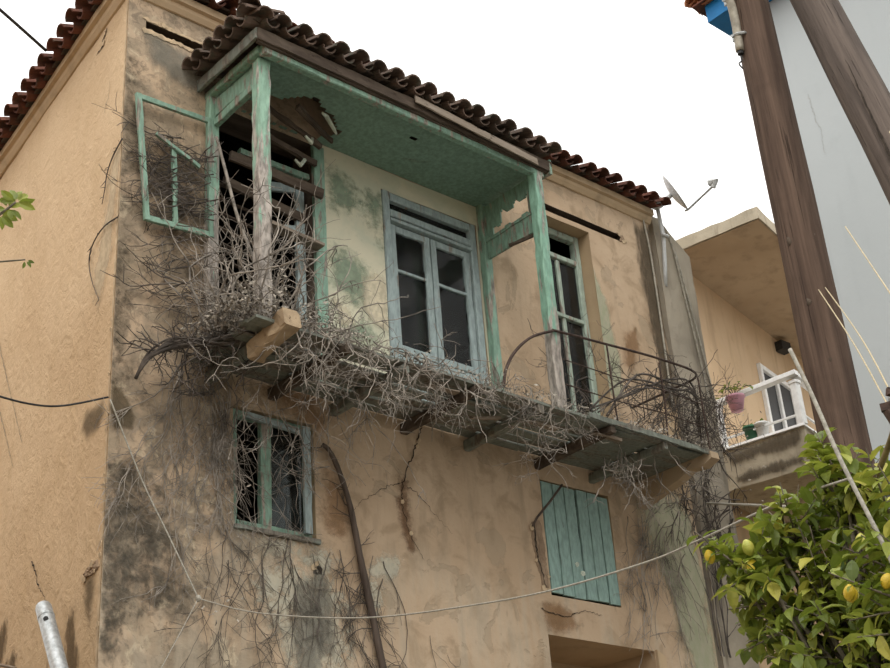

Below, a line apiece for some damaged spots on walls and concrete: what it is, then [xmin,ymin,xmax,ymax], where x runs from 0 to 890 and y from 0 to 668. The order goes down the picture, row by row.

leakage [101,461,183,651]
crack [354,427,451,558]